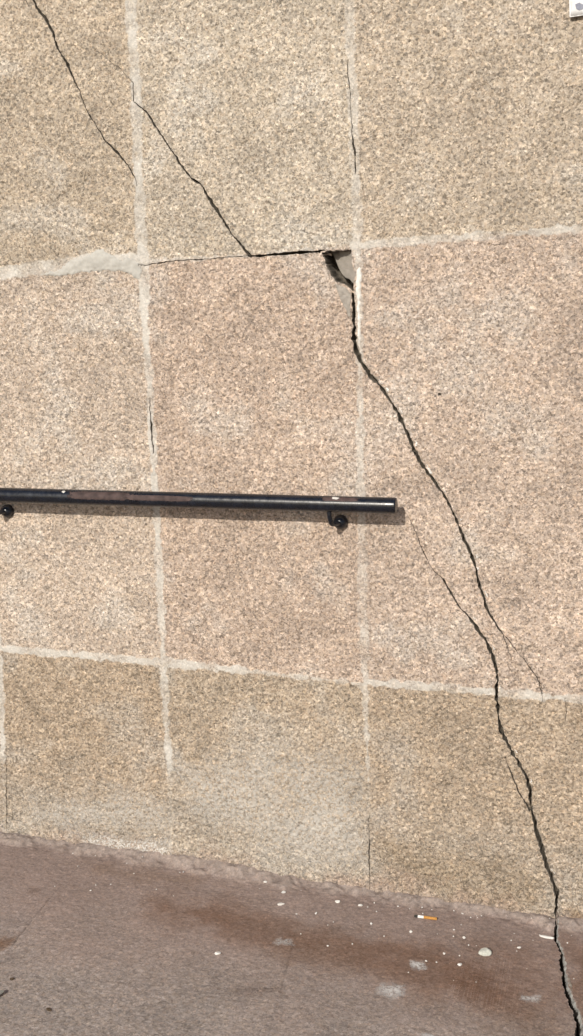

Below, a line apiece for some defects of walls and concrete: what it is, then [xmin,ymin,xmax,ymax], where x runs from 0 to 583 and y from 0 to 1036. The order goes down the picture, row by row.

crack [24,0,138,185]
crack [94,48,332,267]
crack [346,61,357,173]
spalling [320,248,357,318]
crack [147,399,155,453]
crack [350,267,568,919]
crack [2,749,10,830]